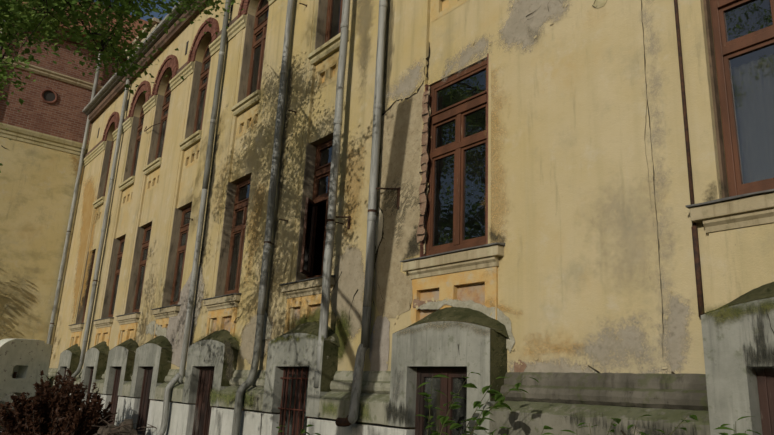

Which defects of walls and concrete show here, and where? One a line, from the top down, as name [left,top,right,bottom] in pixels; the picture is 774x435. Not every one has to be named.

peeling [500,0,569,51]
crack [374,42,430,266]
spalling [330,84,600,373]
crack [641,0,664,350]
leakage [744,312,774,370]